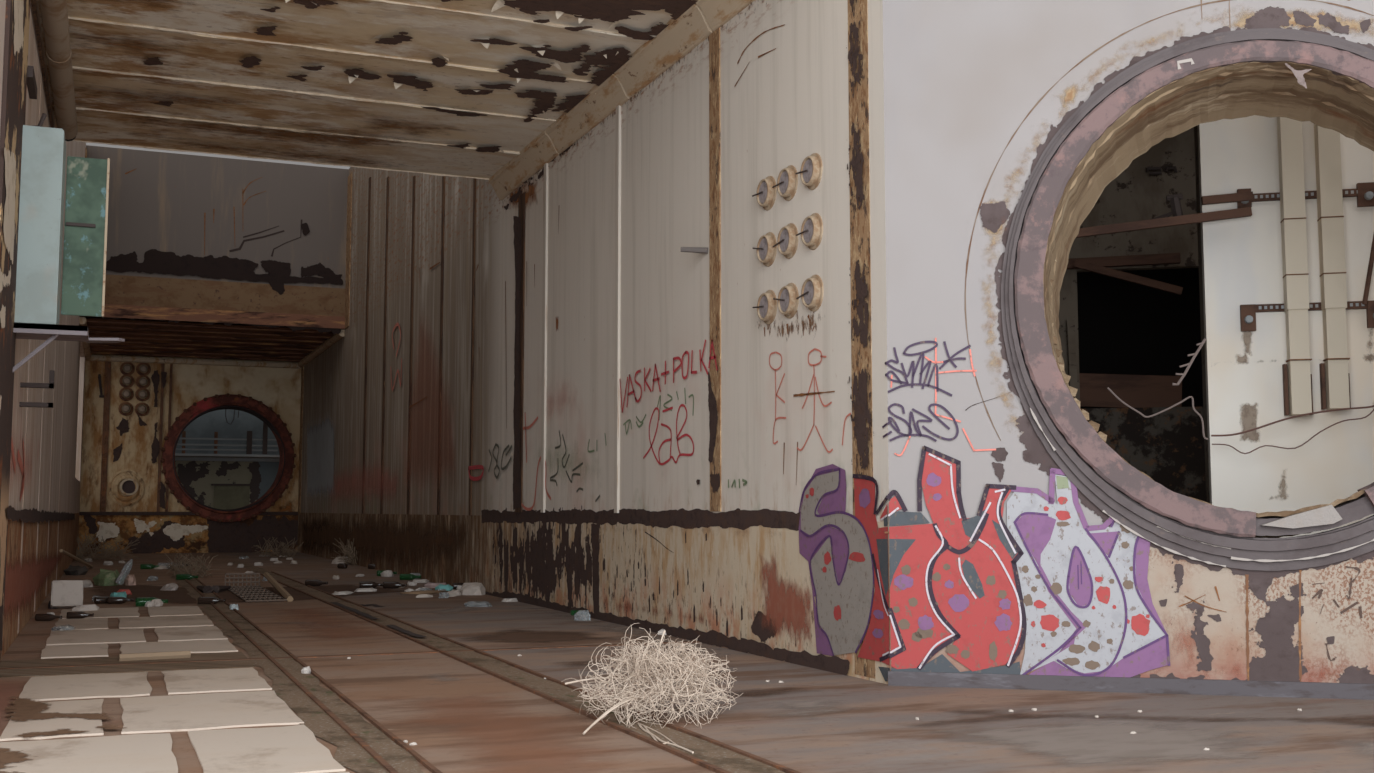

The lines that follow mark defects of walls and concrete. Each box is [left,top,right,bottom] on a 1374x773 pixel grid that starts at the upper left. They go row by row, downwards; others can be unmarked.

peeling [14,0,24,54]
peeling [344,0,698,122]
peeling [846,0,863,97]
corrosion [1061,68,1102,107]
corrosion [1282,11,1373,34]
peeling [847,122,864,212]
peeling [0,147,16,328]
peeling [106,249,343,295]
peeling [979,6,1374,482]
peeling [7,461,298,554]
corrosion [751,561,810,642]
peeling [1077,488,1374,684]